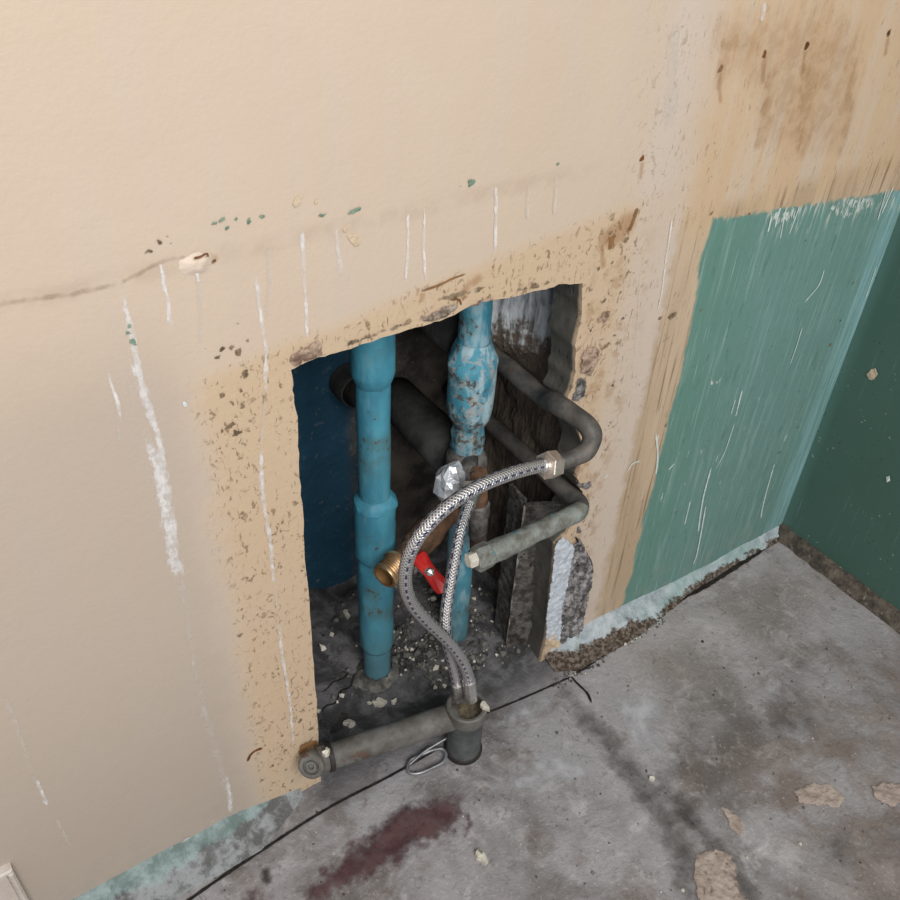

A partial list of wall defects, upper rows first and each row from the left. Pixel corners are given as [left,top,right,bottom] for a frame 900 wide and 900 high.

water stain [160,264,171,321]
flaking render [345,287,497,346]
flaking render [284,340,322,366]
flaking render [572,334,616,401]
water stain [123,300,183,574]
flaking render [546,527,593,649]
flaking render [372,697,397,707]
spalling [795,782,845,808]
spalling [872,782,900,807]
spalling [693,849,749,900]